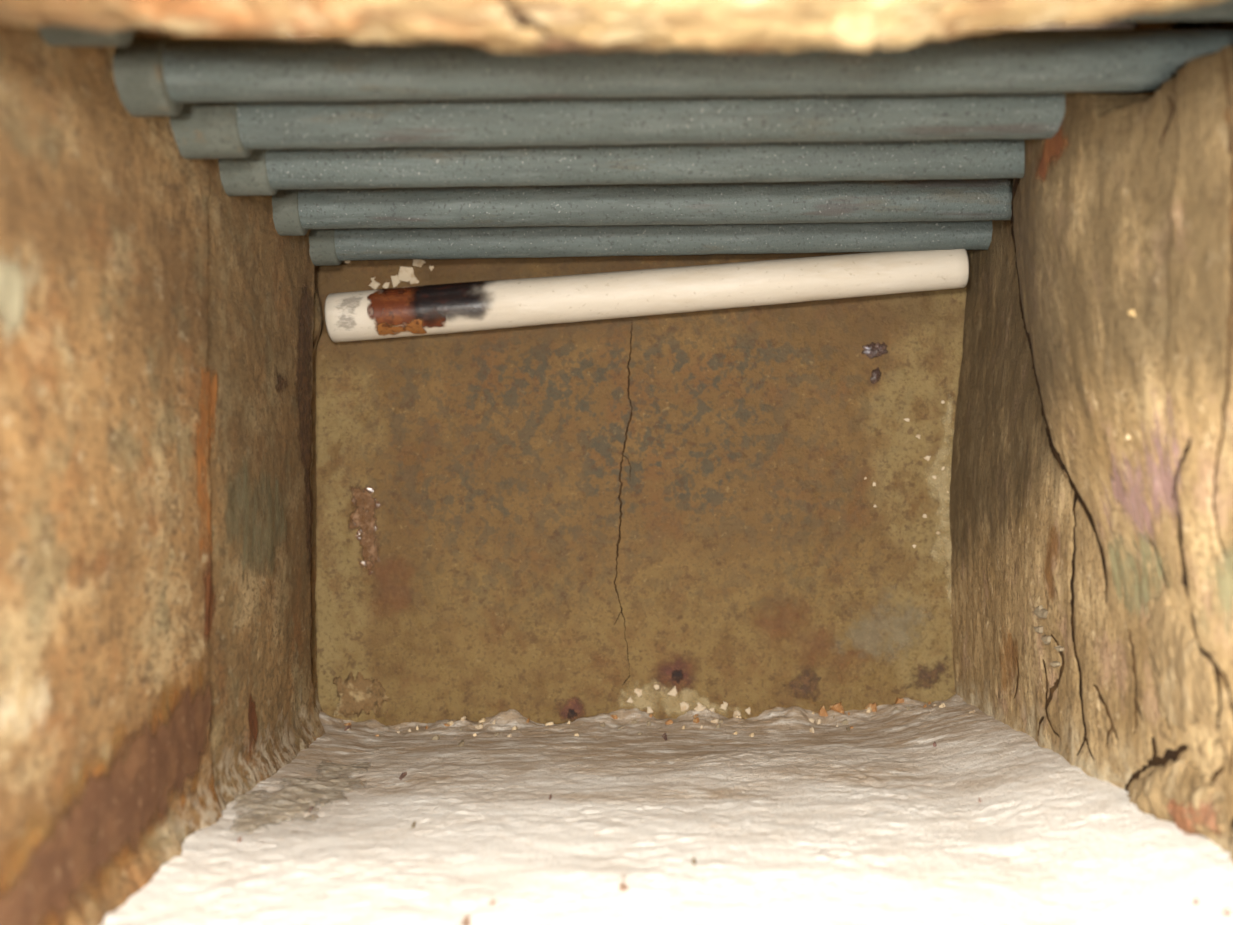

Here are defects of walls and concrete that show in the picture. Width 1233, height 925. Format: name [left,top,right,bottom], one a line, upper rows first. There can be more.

crack [500,0,556,39]
crack [1011,47,1233,792]
crack [614,322,632,684]
corrosion [658,658,693,689]
corrosion [561,698,584,719]
corrosion [0,664,221,925]
crack [1225,820,1233,848]